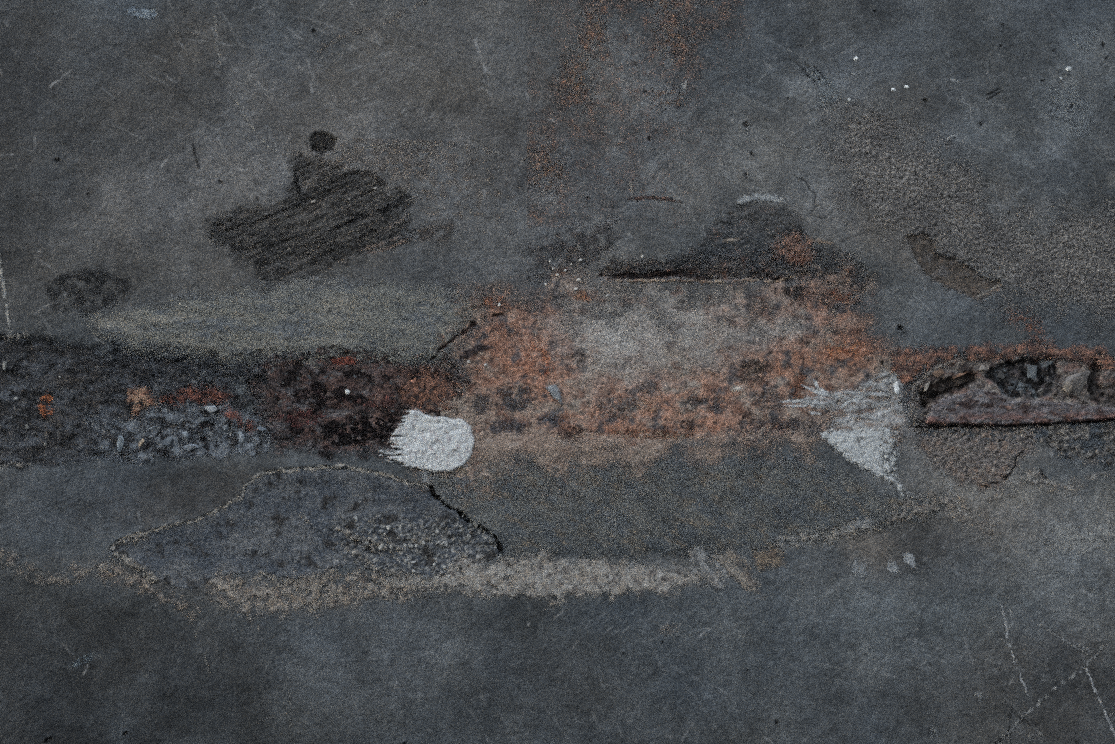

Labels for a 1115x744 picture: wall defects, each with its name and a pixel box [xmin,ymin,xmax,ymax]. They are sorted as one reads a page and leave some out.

spalling [600,257,819,297]
spalling [0,333,275,470]
corrosion [127,388,154,414]
corrosion [169,265,1115,500]
flaking render [0,464,871,621]